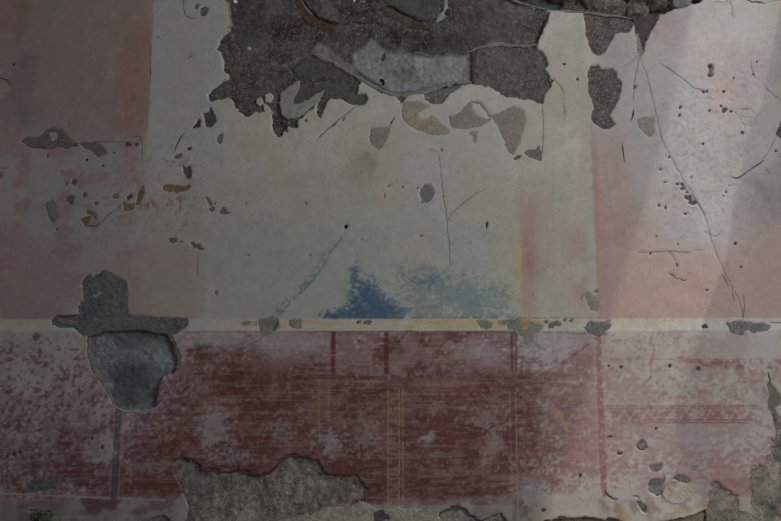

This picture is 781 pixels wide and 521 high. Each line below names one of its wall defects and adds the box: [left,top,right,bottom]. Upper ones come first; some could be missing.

peeling [193,0,658,161]
peeling [21,128,138,167]
crack [732,122,781,179]
crack [621,55,745,317]
flaking render [705,372,781,521]
flaking render [174,454,368,521]
flaking render [648,465,697,496]